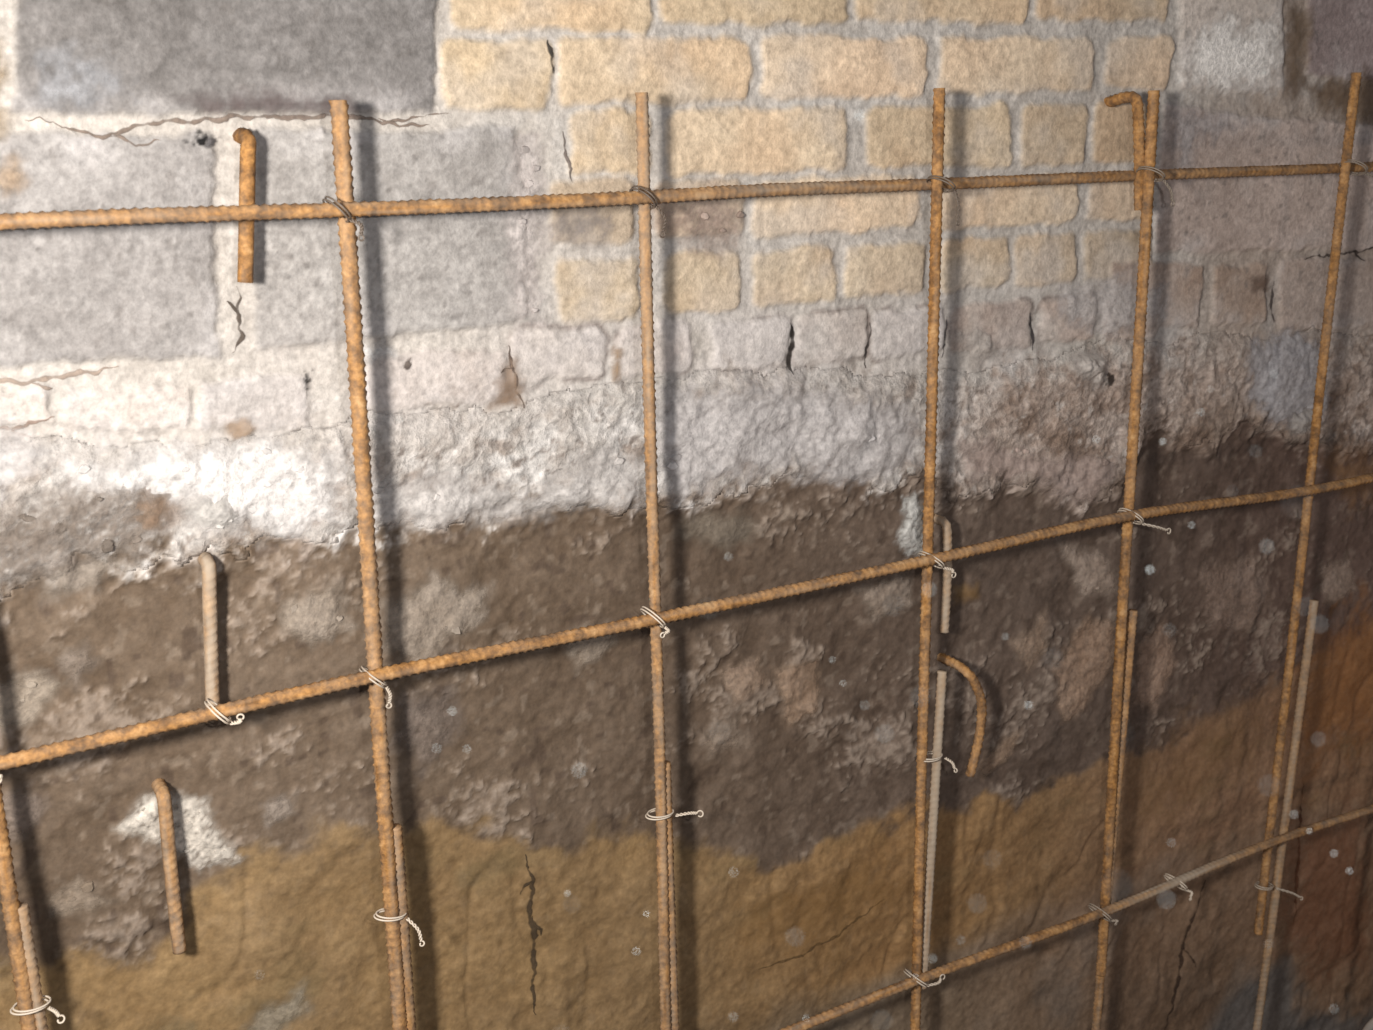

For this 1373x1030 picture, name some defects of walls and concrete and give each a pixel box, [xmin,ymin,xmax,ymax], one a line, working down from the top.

crack [546,40,554,73]
damp [1179,10,1373,123]
crack [25,113,444,147]
crack [562,131,572,181]
crack [227,286,245,348]
crack [786,323,794,375]
crack [863,324,871,368]
damp [66,421,343,536]
damp [372,452,638,523]
damp [967,446,1111,501]
damp [899,494,923,555]
crack [520,854,542,1015]